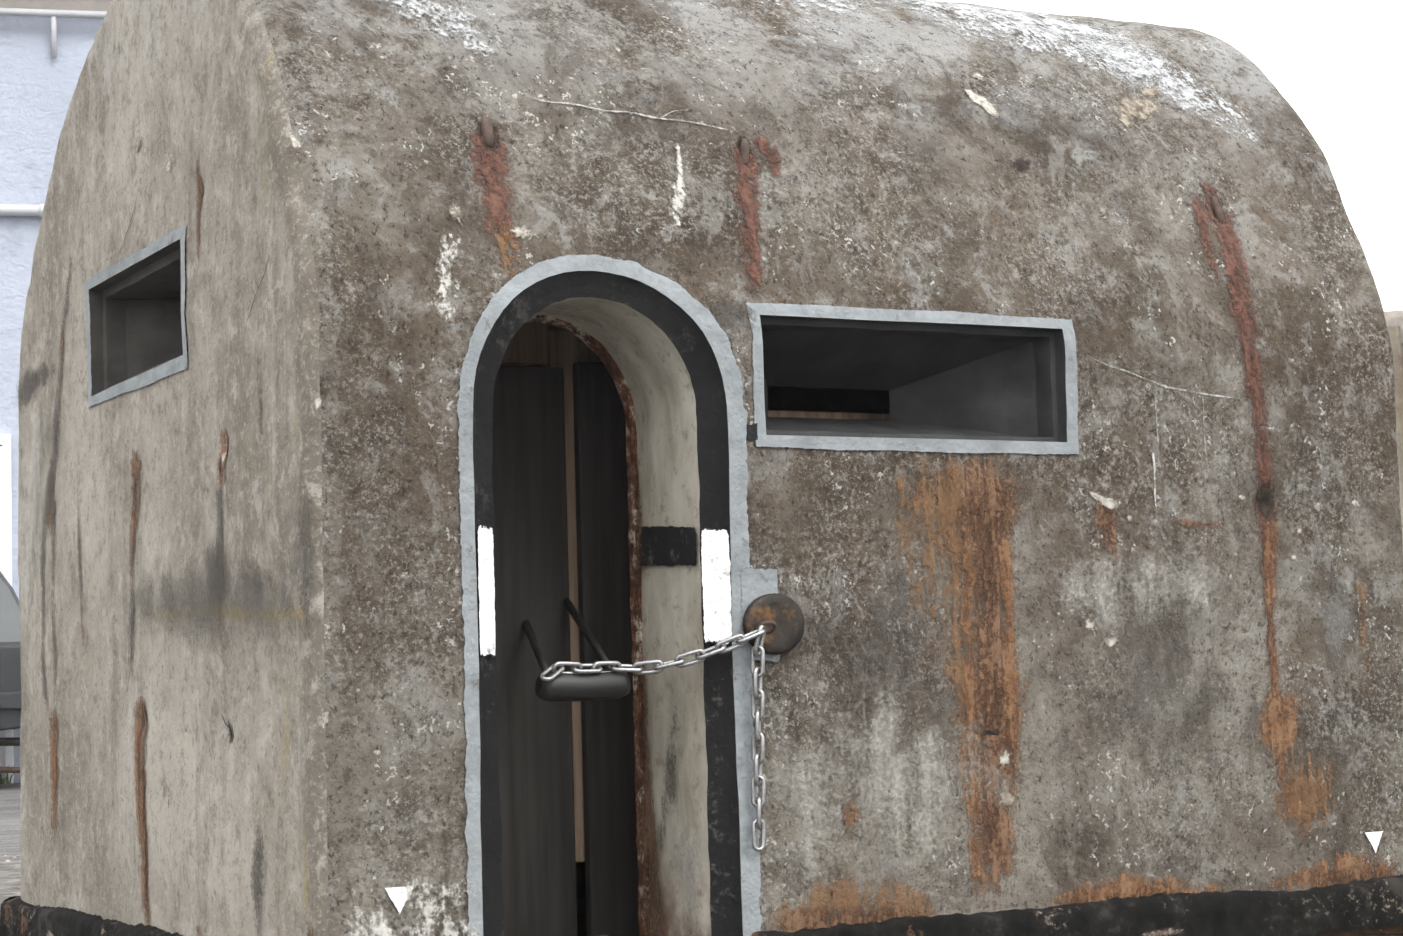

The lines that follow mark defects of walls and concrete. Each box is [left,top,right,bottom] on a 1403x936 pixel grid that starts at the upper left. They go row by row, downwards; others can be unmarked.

rust [470,117,518,275]
rust [731,136,782,291]
rust [128,449,140,662]
rust [215,430,227,620]
rust [1193,183,1335,836]
rust [897,458,1029,912]
rust [49,712,59,837]
rust [134,697,150,925]
rust [770,878,938,932]
rust [1052,872,1224,906]
rust [1271,852,1396,889]